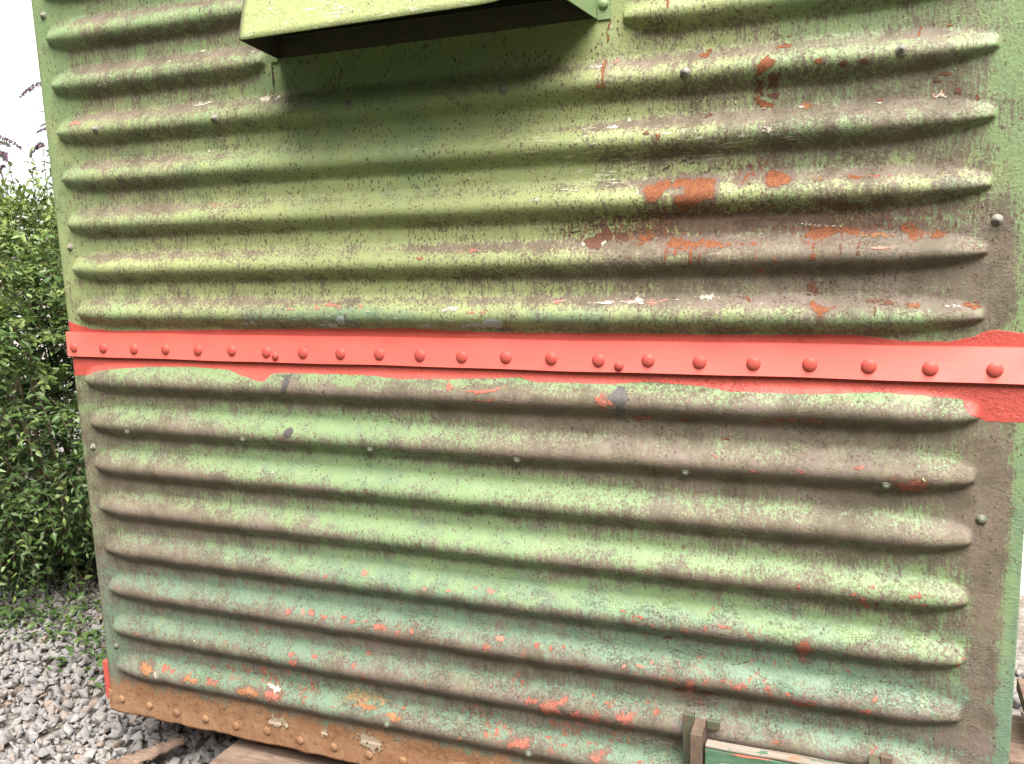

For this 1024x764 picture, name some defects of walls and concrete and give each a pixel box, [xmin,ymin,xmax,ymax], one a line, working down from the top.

corrosion [753,35,792,110]
corrosion [737,163,796,190]
corrosion [635,172,720,213]
corrosion [660,233,762,268]
corrosion [798,219,951,260]
peeling [342,616,414,636]
corrosion [235,682,281,703]
peeling [268,712,290,729]
peeling [355,730,382,755]